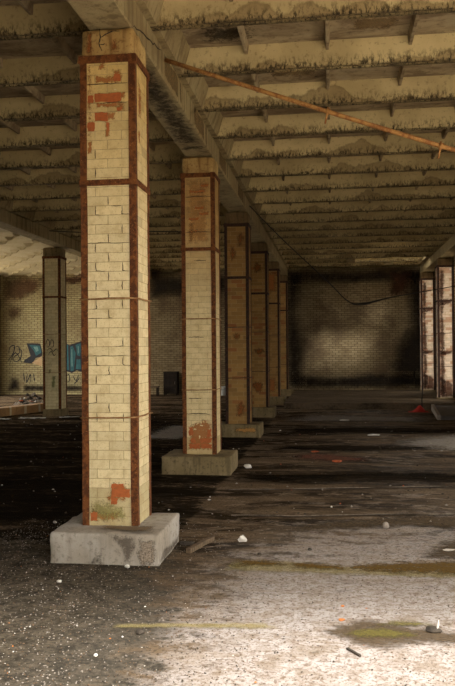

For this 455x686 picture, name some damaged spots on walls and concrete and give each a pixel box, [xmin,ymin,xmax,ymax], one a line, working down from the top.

peeling [87,63,125,154]
damp [147,57,206,150]
peeling [189,420,212,450]
peeling [107,483,131,505]